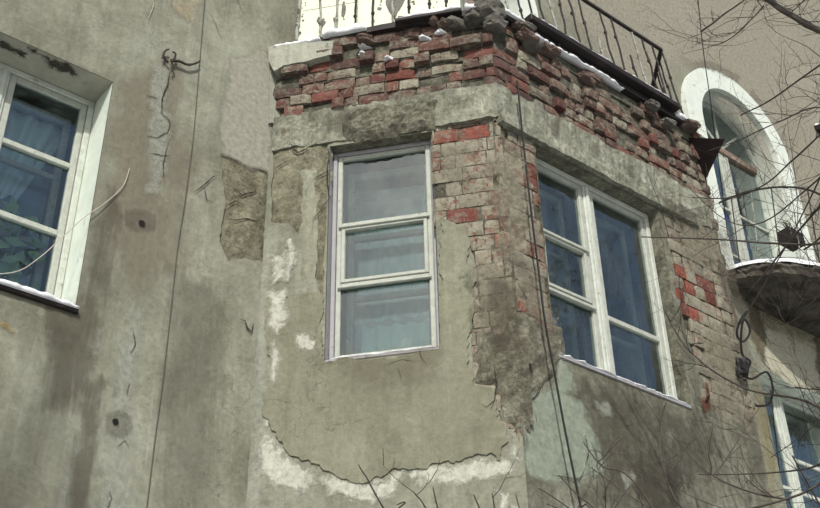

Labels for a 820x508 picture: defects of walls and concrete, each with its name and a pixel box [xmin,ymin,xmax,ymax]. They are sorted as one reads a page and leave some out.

crack [148,73,171,175]
spalling [220,145,333,382]
spalling [258,0,763,504]
peeling [497,490,517,508]